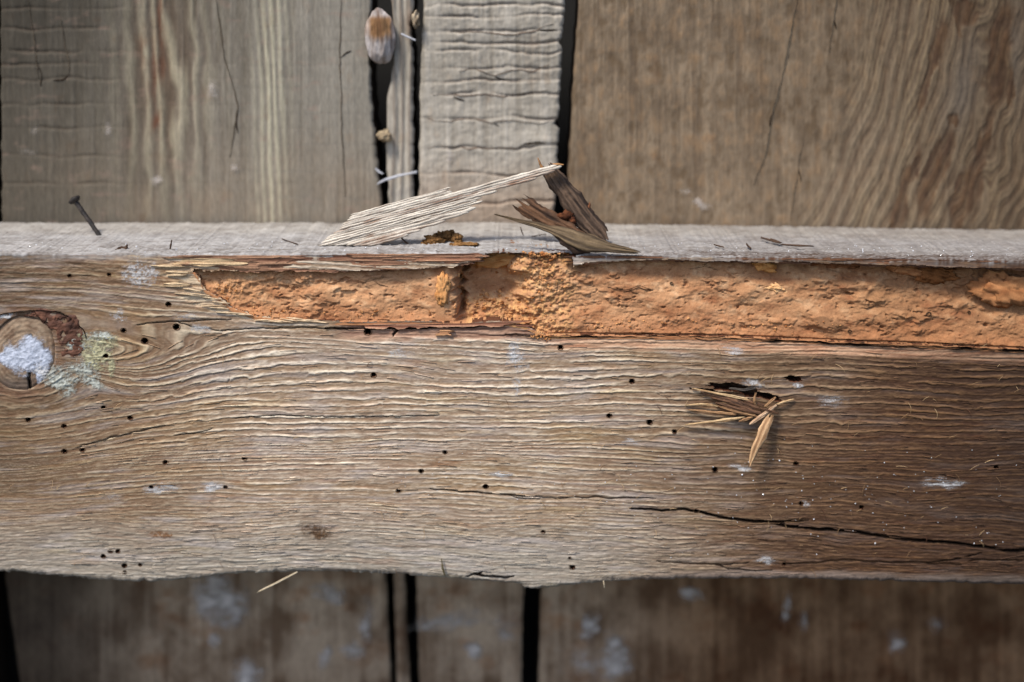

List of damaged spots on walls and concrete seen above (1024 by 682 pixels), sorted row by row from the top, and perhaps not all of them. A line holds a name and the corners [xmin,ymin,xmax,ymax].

crack [216,2,239,154]
crack [754,0,798,183]
crack [791,141,804,215]
spalling [192,240,1024,353]
water stain [0,335,52,383]
crack [430,488,1024,571]